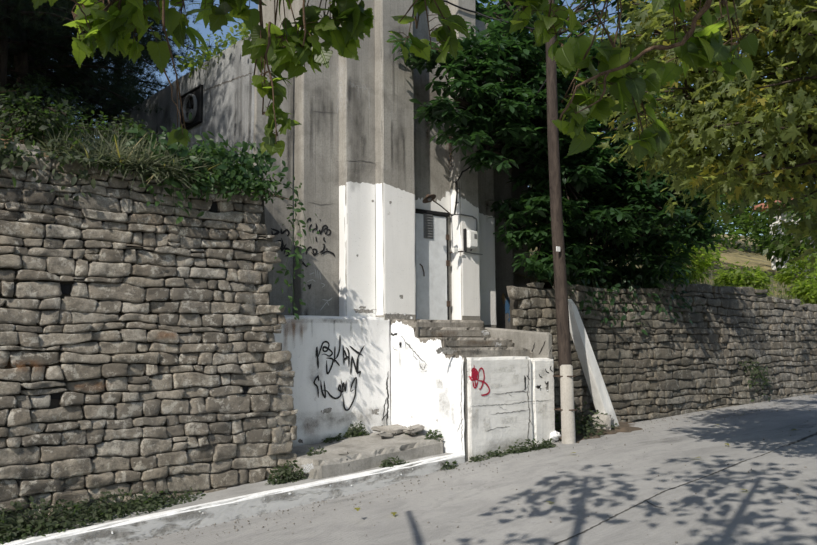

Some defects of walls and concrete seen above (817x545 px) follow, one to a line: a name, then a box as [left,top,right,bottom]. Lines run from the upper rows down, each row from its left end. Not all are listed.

crack [390,333,426,370]
spalling [436,347,457,355]
crack [381,377,389,422]
crack [458,342,552,446]